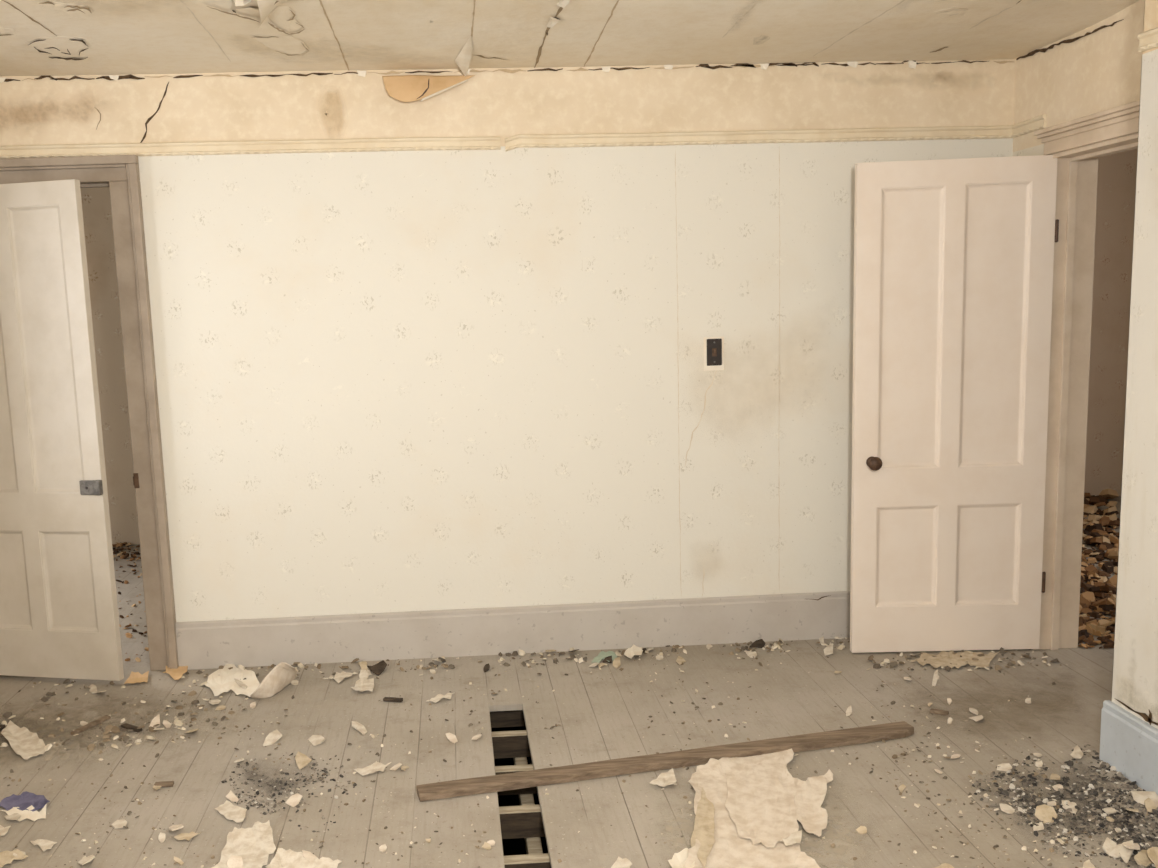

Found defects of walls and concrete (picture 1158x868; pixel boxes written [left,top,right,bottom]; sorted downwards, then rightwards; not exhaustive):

crack [0,0,1124,143]